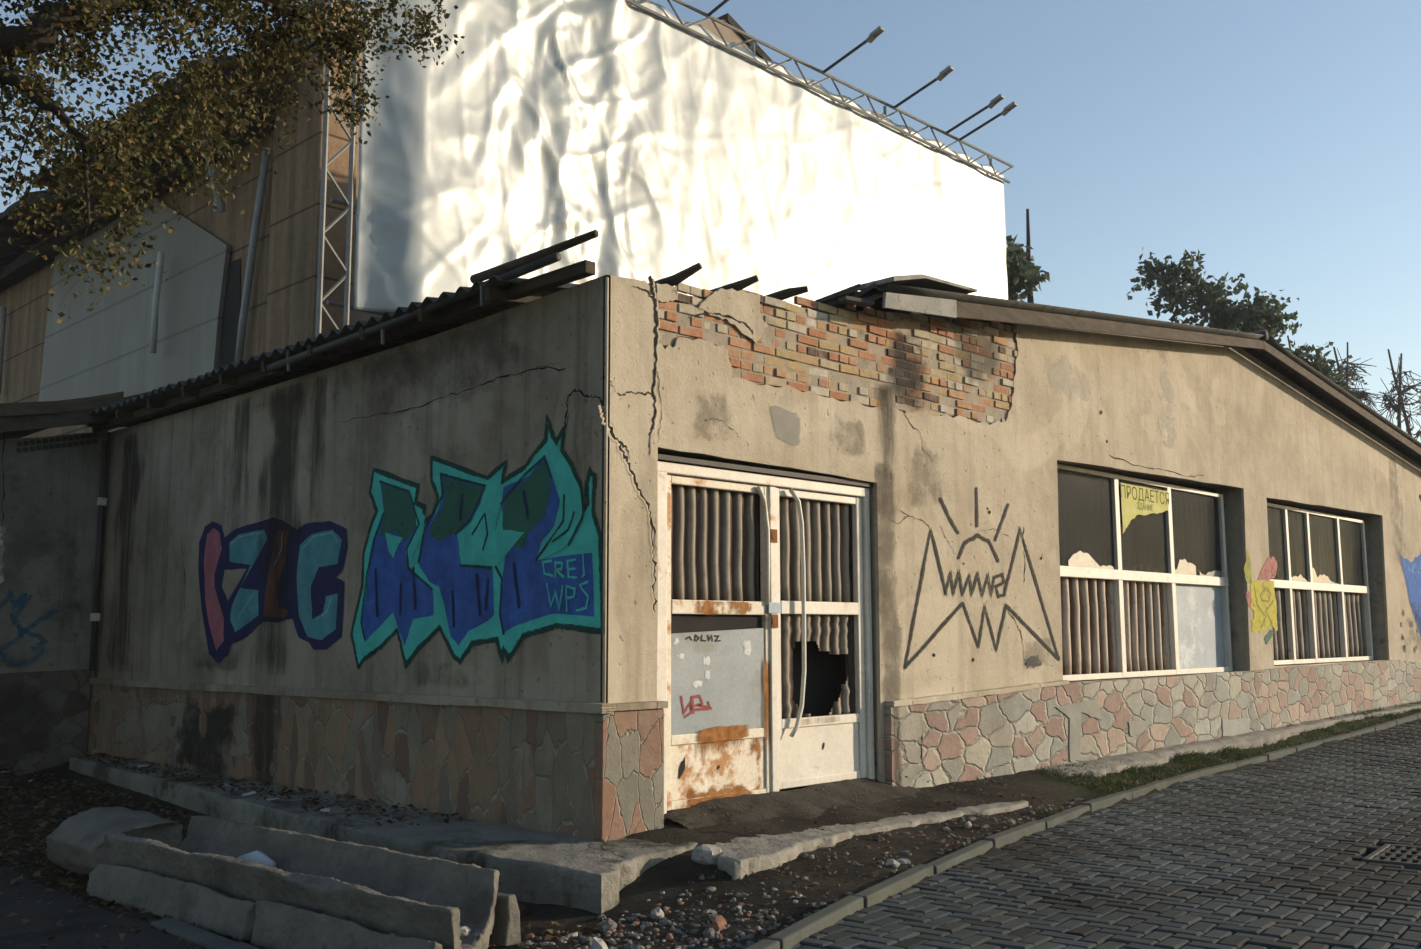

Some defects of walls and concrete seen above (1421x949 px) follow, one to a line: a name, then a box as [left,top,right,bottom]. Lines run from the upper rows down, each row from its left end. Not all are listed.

crack [695,312,754,334]
flaking render [654,283,1020,423]
crack [340,275,662,615]
leakage [883,385,893,438]
leakage [113,436,140,648]
leakage [260,383,321,655]
corrosion [695,601,751,615]
corrosion [698,660,771,760]
corrosion [687,785,760,808]